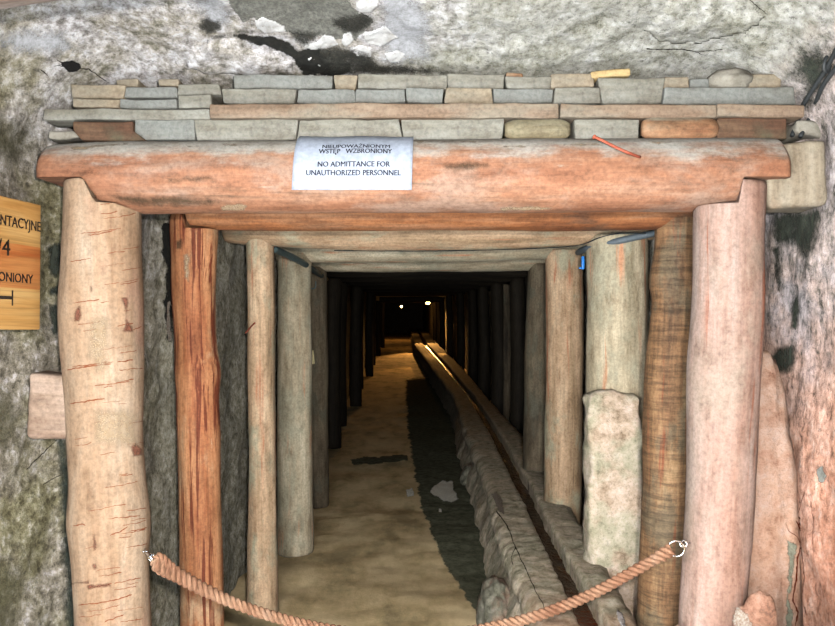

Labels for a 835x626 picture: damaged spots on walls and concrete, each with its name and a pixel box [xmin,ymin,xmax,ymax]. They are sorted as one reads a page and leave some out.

peeling [229,0,405,67]
crack [647,48,723,56]